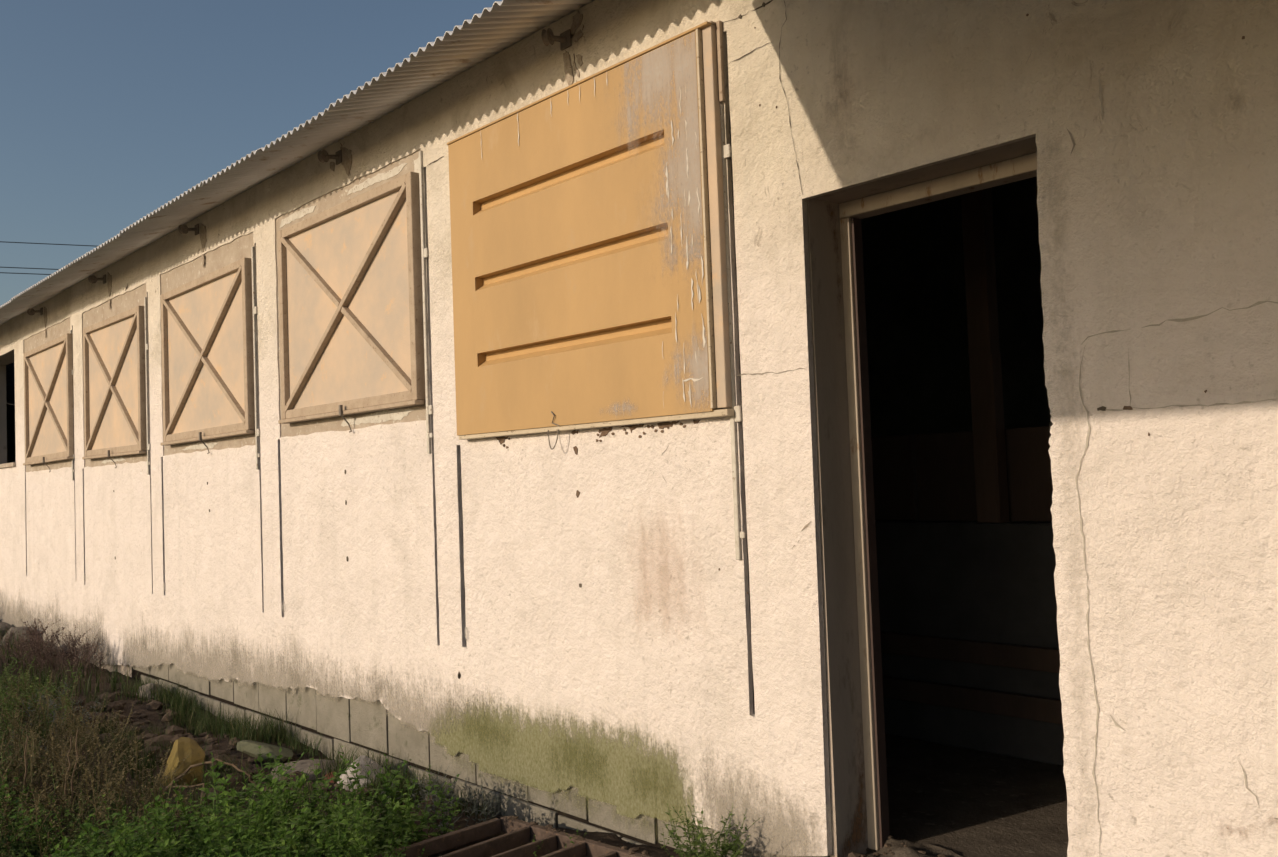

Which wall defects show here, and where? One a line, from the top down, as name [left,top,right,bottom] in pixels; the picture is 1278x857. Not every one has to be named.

crack [722,0,803,195]
peeling [596,31,709,442]
leakage [0,598,501,742]
crack [1075,301,1278,857]
leakage [704,773,816,857]